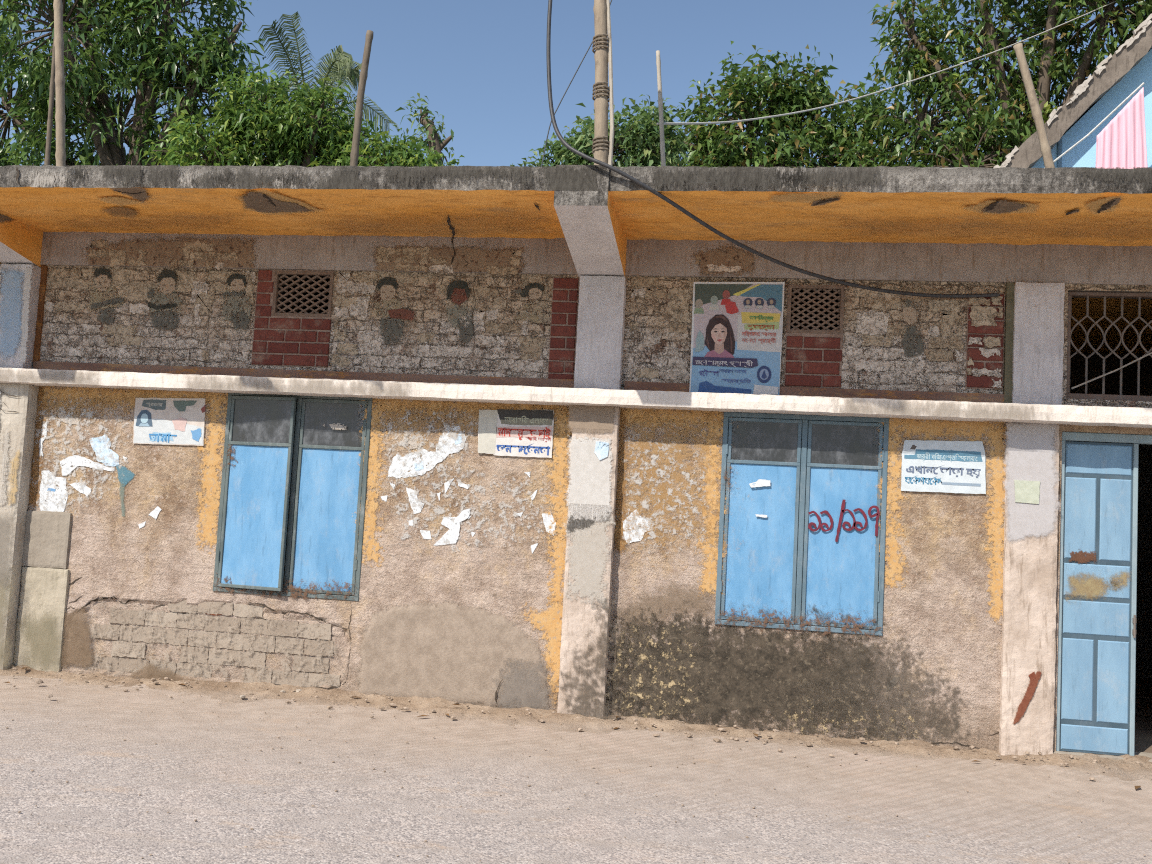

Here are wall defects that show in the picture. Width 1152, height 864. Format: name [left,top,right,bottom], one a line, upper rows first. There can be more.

crack [447,215,476,355]
peeling [844,286,1004,388]
peeling [0,386,228,554]
spalling [61,600,344,692]
corrosion [212,576,357,603]
peeling [355,398,727,706]
water stain [561,588,968,746]
corrosion [715,607,884,640]
corrosion [1013,671,1041,724]
corrosion [1066,550,1129,600]